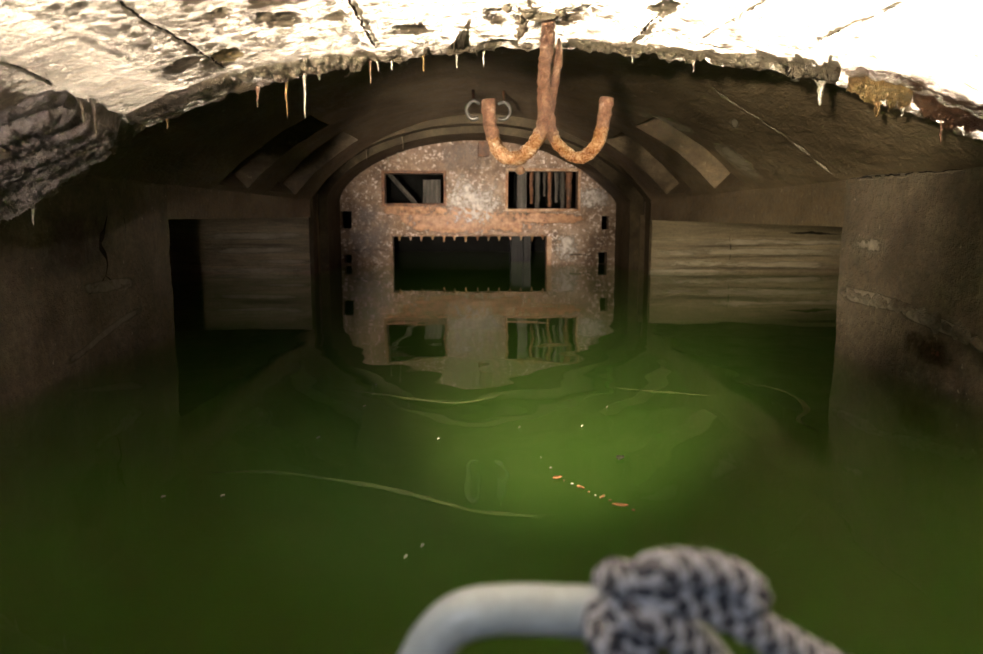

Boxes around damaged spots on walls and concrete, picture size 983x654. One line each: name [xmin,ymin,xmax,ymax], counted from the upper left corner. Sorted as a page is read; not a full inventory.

crack [114,0,228,70]
crack [348,0,380,48]
water stain [451,18,518,57]
crack [811,0,908,43]
crack [0,62,56,87]
water stain [229,49,402,83]
water stain [567,38,983,133]
rust [836,66,983,120]
spalling [0,48,244,223]
crack [711,86,962,181]
rust [384,206,584,234]